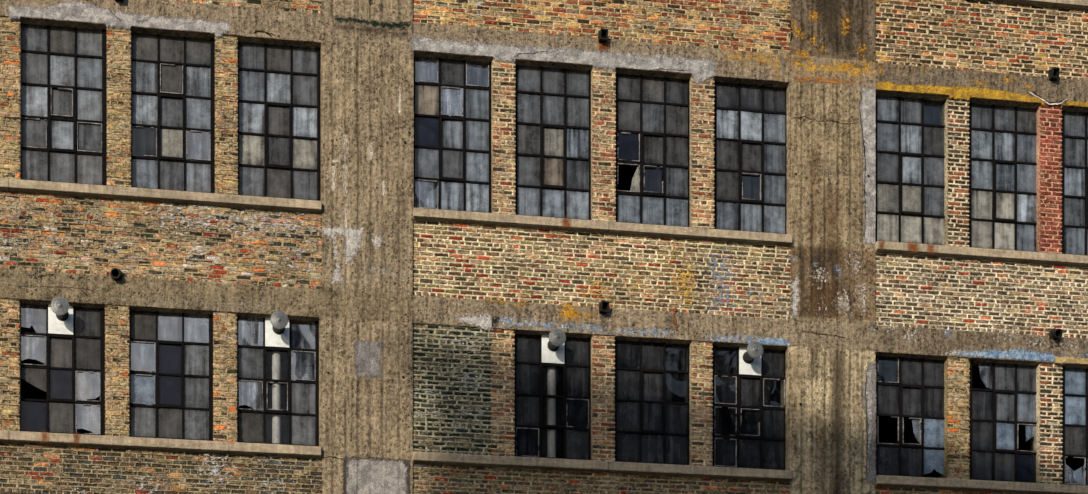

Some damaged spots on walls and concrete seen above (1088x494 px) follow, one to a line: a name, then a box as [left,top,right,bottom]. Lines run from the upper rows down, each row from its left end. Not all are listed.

water stain [816,0,864,50]
peeling [320,225,414,284]
water stain [802,246,839,314]
peeling [705,330,760,343]
flaking render [993,327,1088,364]